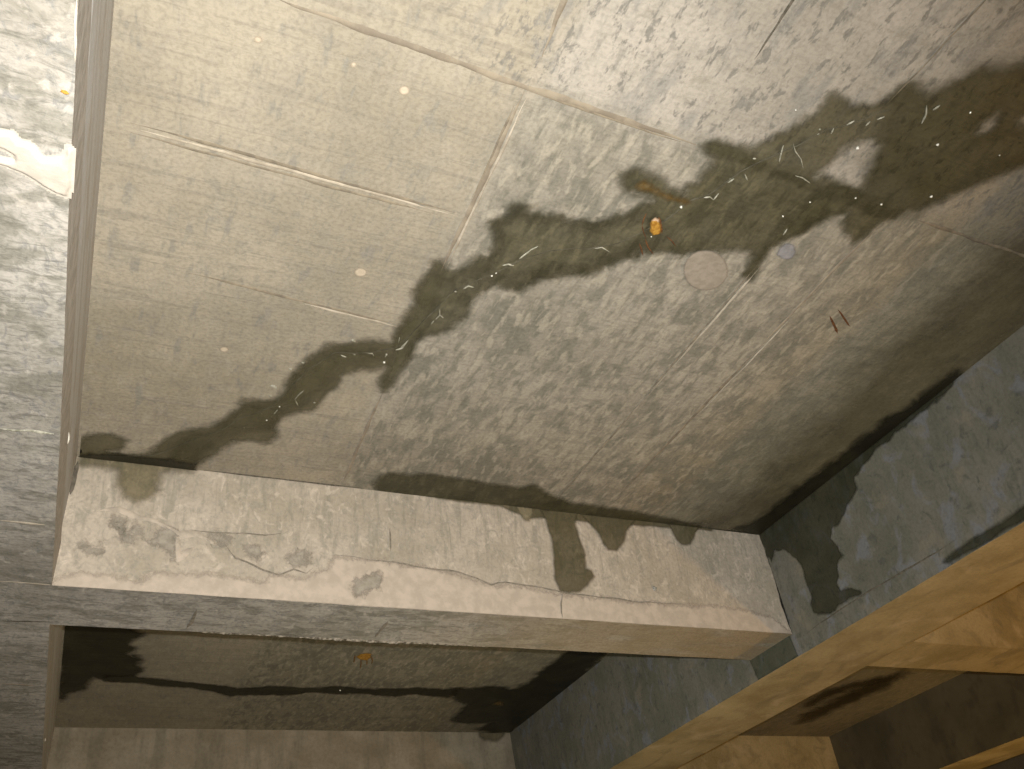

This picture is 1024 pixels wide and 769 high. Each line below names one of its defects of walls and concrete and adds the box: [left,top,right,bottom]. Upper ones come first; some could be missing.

rust [639,214,675,255]
water stain [78,65,1024,501]
water stain [375,250,1024,680]
spalling [109,515,177,561]
crack [195,530,313,575]
spalling [353,572,383,597]
crack [339,530,676,617]
water stain [59,625,144,699]
water stain [451,651,607,741]
water stain [799,673,903,722]